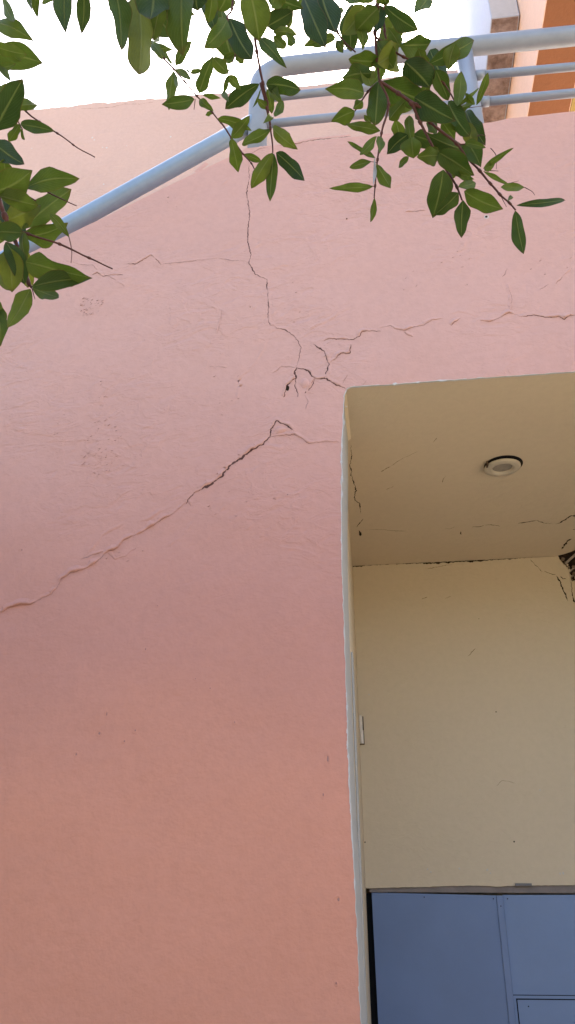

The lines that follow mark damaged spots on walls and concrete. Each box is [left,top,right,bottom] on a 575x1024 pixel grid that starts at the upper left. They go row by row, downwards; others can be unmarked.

crack [0,134,575,613]